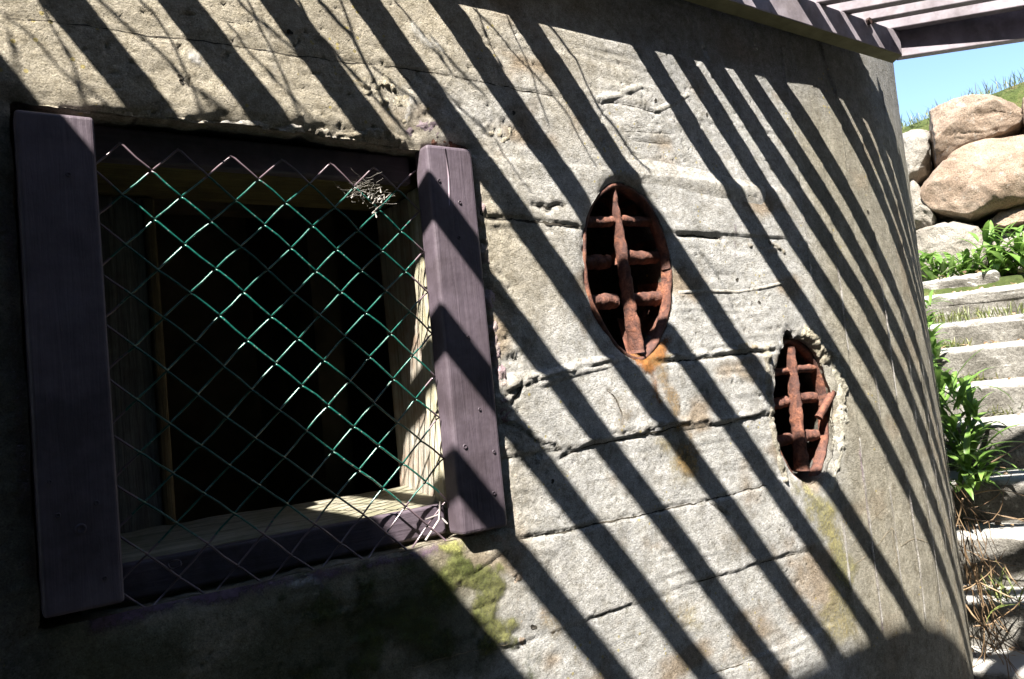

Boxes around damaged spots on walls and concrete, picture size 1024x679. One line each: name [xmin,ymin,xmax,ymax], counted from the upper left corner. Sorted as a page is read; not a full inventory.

spalling [762,345,789,483]
spalling [796,324,850,493]